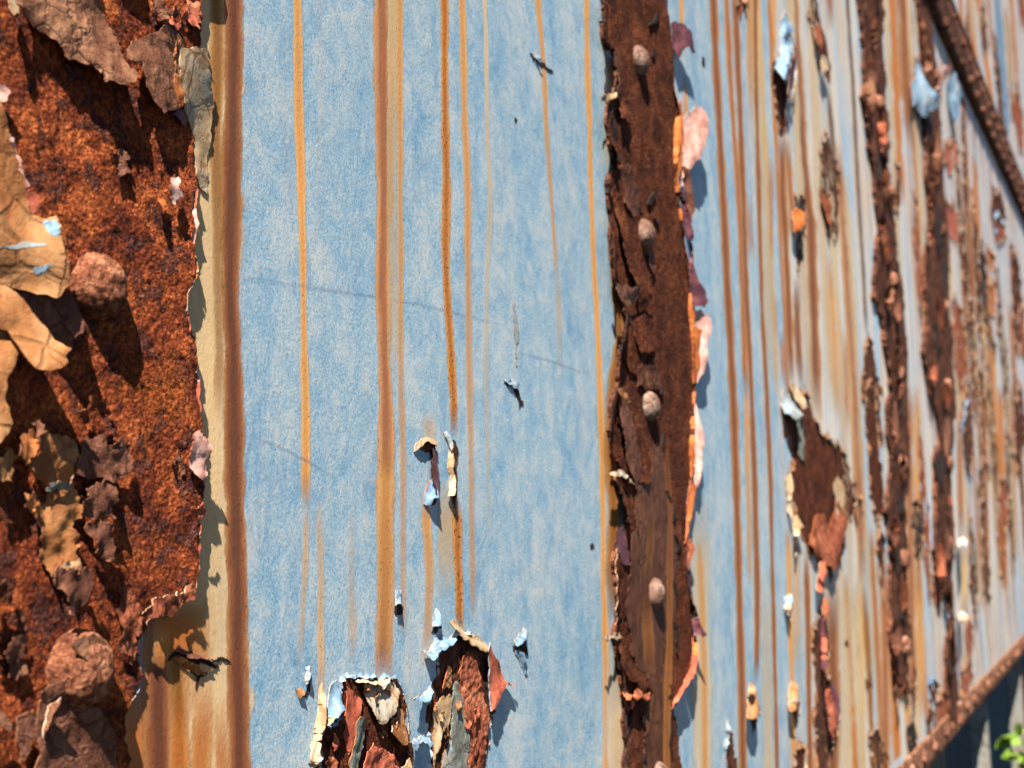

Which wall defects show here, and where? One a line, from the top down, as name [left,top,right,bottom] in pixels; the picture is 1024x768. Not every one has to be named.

peeling [0,85,85,443]
corrosion [0,391,133,616]
peeling [8,0,214,346]
corrosion [115,0,254,768]
corrosion [373,0,404,661]
peeling [294,608,516,768]
peeling [413,431,459,509]
corrosion [440,0,473,421]
corrosion [584,0,682,768]
peeling [770,10,797,138]
peeling [781,331,889,768]
corrosion [709,0,1024,768]